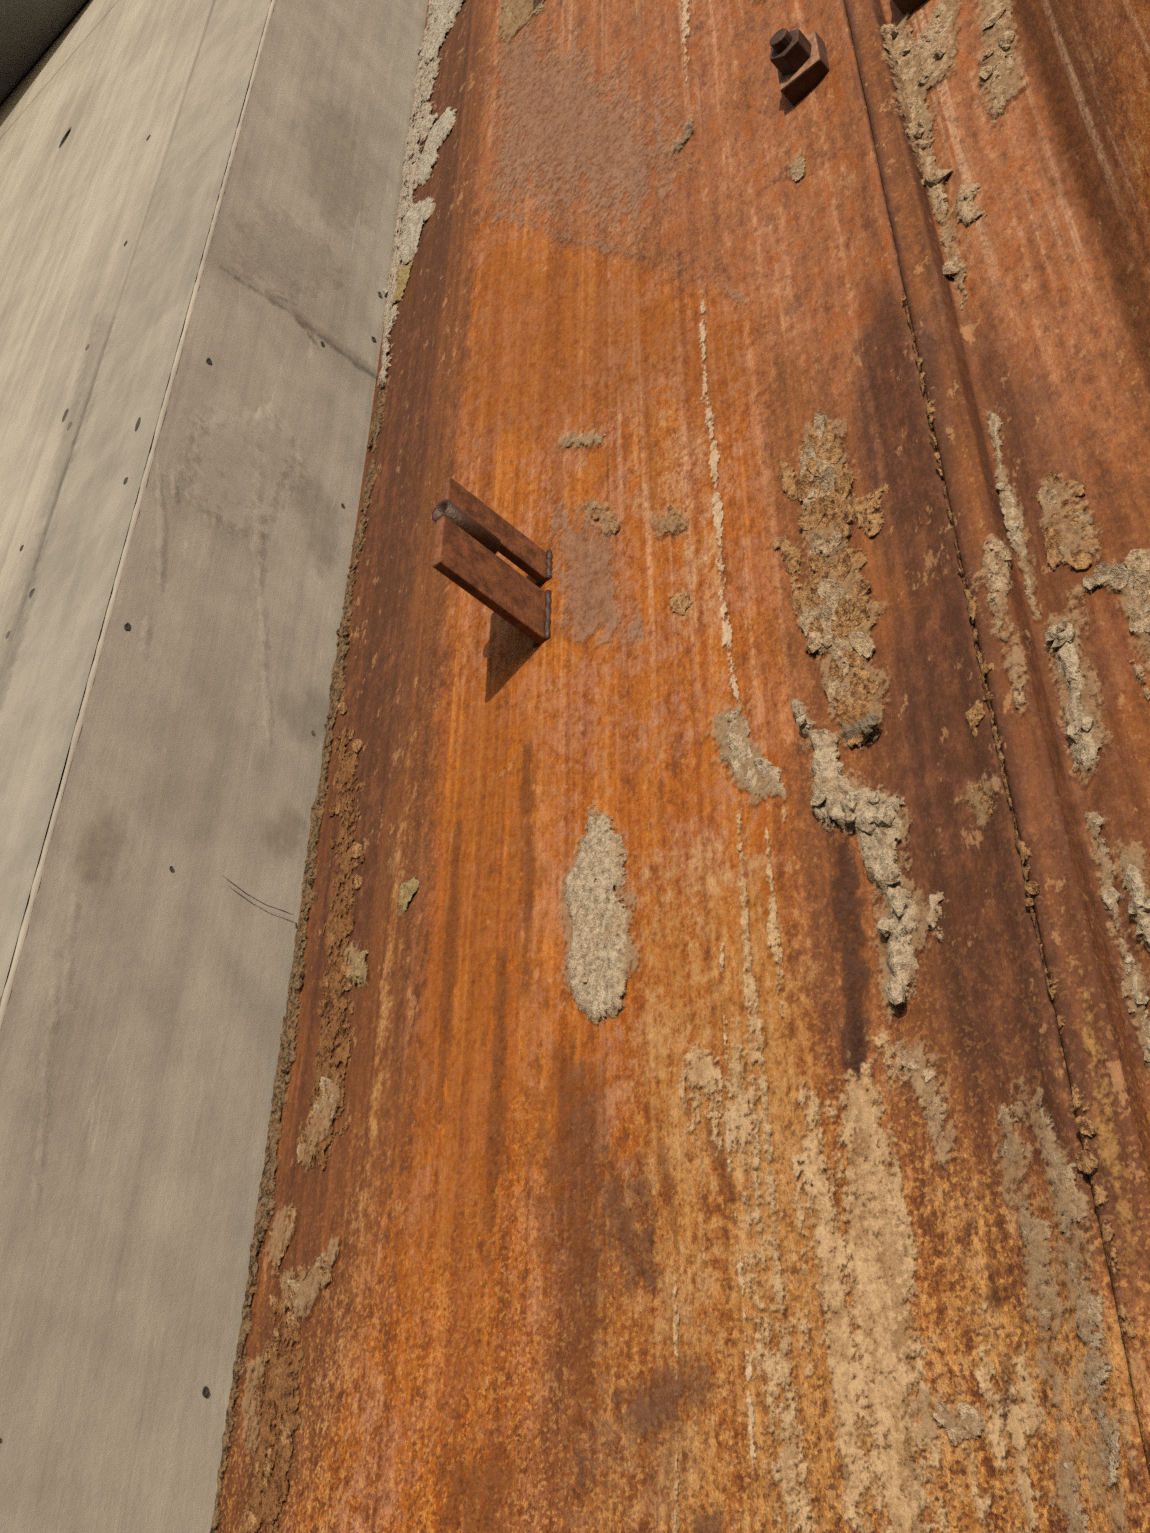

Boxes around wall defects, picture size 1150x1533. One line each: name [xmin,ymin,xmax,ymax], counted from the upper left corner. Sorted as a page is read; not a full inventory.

rust [785,149,805,183]
rust [554,428,607,449]
rust [651,505,688,536]
rust [772,409,889,748]
rust [900,285,953,521]
rust [1035,470,1102,571]
rust [954,541,1065,1041]
rust [297,702,365,1178]
rust [832,836,870,1081]
rust [1066,1070,1120,1274]
rust [241,1204,339,1533]
rust [999,1365,1016,1423]